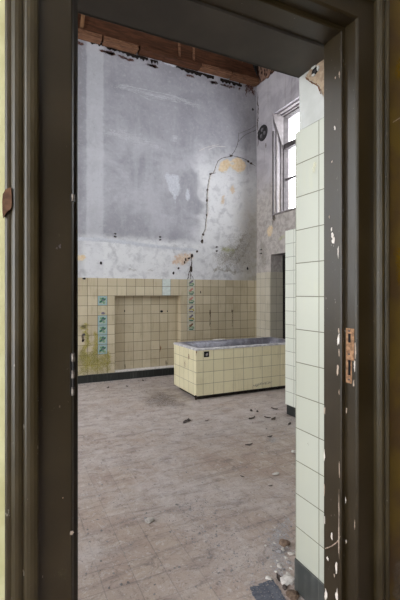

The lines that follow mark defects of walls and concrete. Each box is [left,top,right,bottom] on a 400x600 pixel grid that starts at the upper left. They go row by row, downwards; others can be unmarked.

spalling [78,40,242,89]
spalling [305,59,324,97]
crack [200,97,259,244]
flaking render [219,157,246,174]
peeling [78,237,198,269]
damp [78,323,117,376]